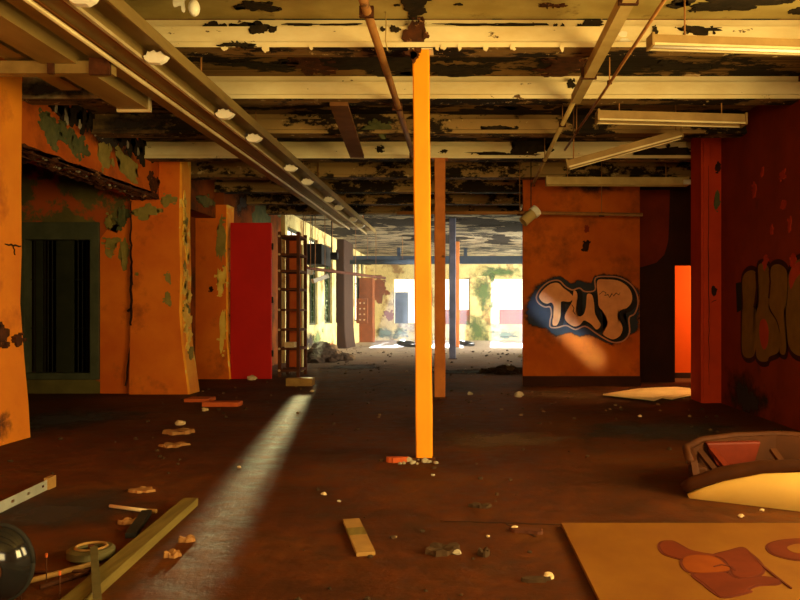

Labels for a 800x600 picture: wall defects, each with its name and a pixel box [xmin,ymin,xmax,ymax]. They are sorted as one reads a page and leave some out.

peeling [666,0,800,15]
peeling [203,0,362,68]
peeling [319,0,565,77]
peeling [675,24,723,36]
peeling [437,105,597,115]
peeling [467,125,554,162]
peeling [633,144,691,160]
spalling [22,105,216,360]
peeling [319,225,364,237]
peeling [362,217,414,241]
peeling [445,215,522,245]
flaking render [0,322,27,349]